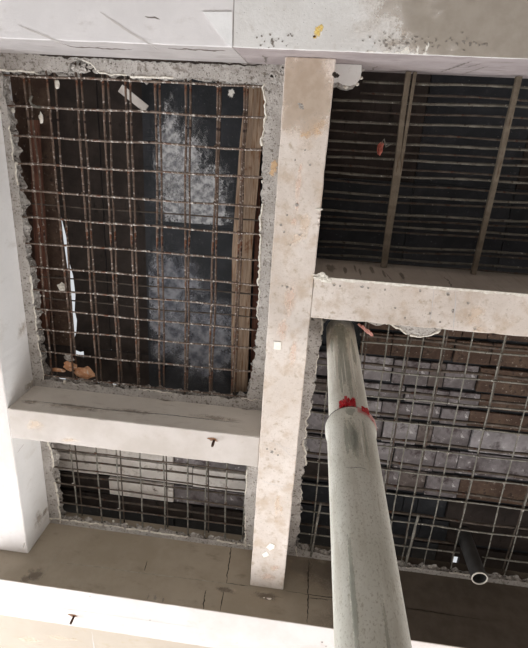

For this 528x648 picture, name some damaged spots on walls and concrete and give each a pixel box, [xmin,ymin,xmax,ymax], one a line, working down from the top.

spalling [0,53,285,410]
spalling [323,190,390,204]
spalling [315,208,528,242]
spalling [318,240,528,275]
spalling [324,64,528,186]
spalling [397,134,528,209]
spalling [40,441,258,550]
spalling [287,317,331,561]
spalling [360,317,528,588]